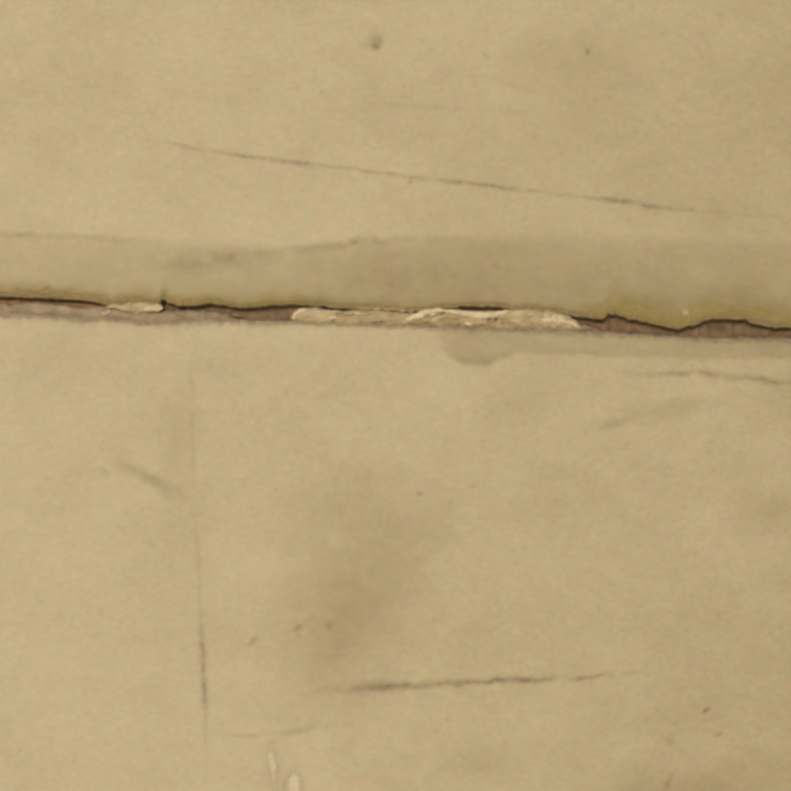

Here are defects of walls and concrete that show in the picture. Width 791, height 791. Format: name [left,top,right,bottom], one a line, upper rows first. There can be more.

peeling [106,302,163,313]
crack [0,293,791,341]
peeling [292,305,592,331]